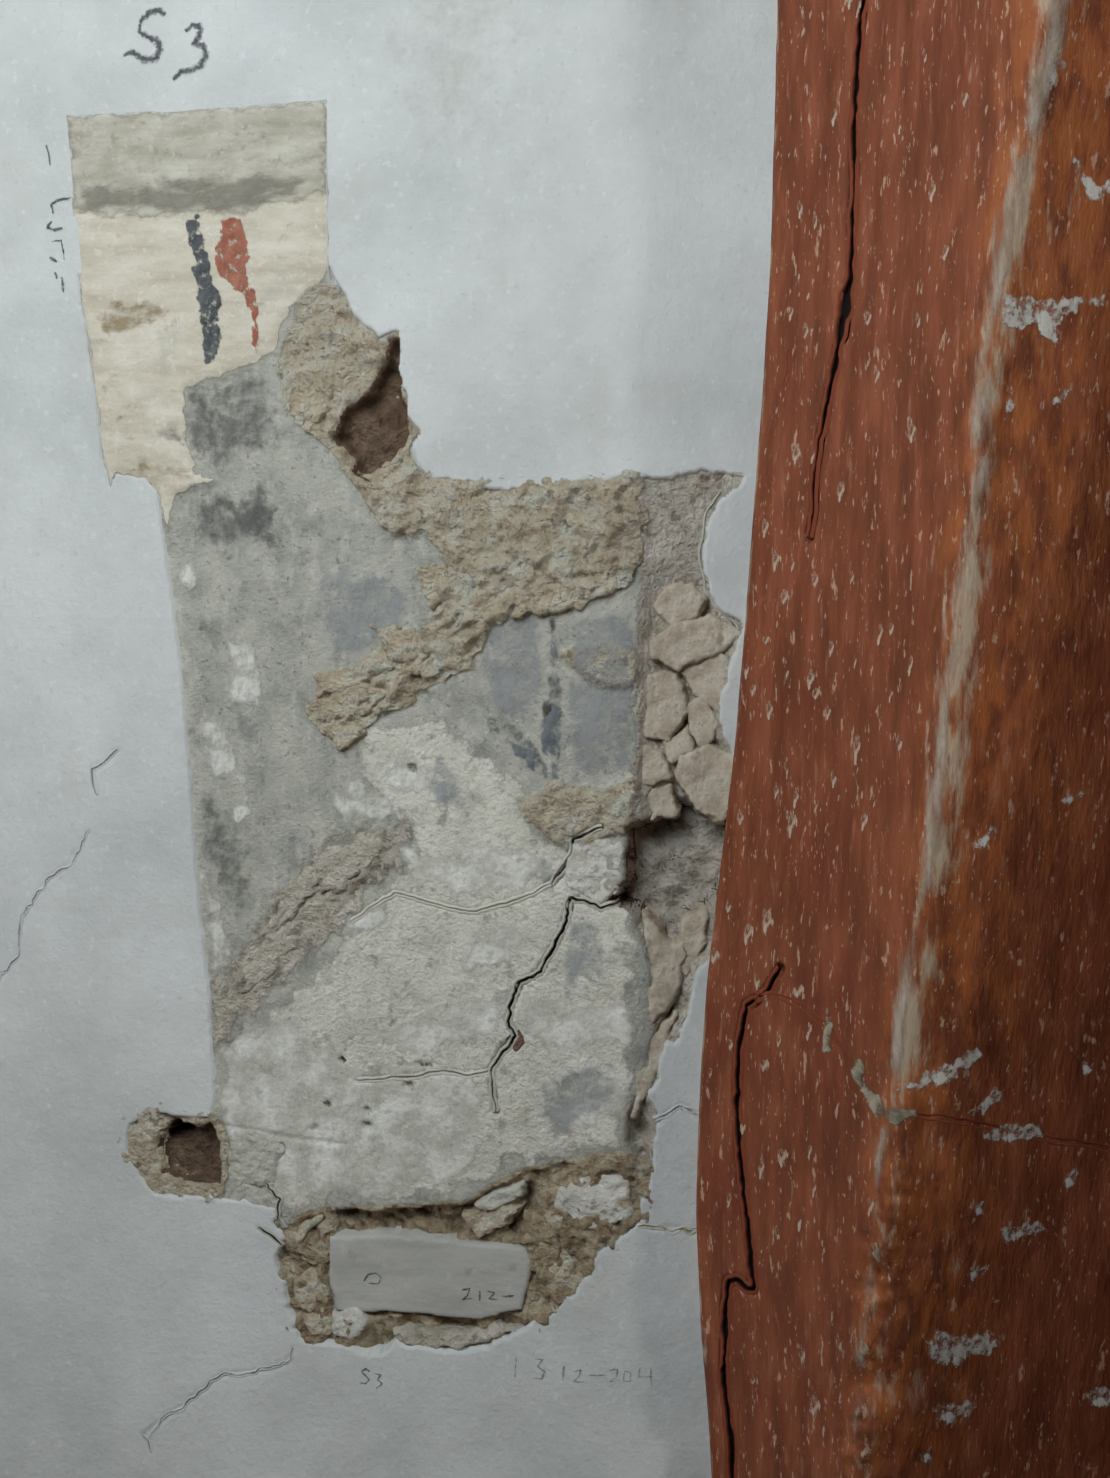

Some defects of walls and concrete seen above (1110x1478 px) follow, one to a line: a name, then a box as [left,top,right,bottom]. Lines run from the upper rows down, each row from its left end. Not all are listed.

crack [805,0,868,538]
peeling [791,443,815,467]
peeling [762,519,819,588]
peeling [783,636,831,720]
flaking render [66,100,774,1350]
crack [90,748,119,795]
peeling [775,757,799,838]
crack [0,830,89,981]
crack [350,824,622,1112]
peeling [758,1149,788,1179]
crack [653,965,847,1478]
peeling [809,1395,825,1437]